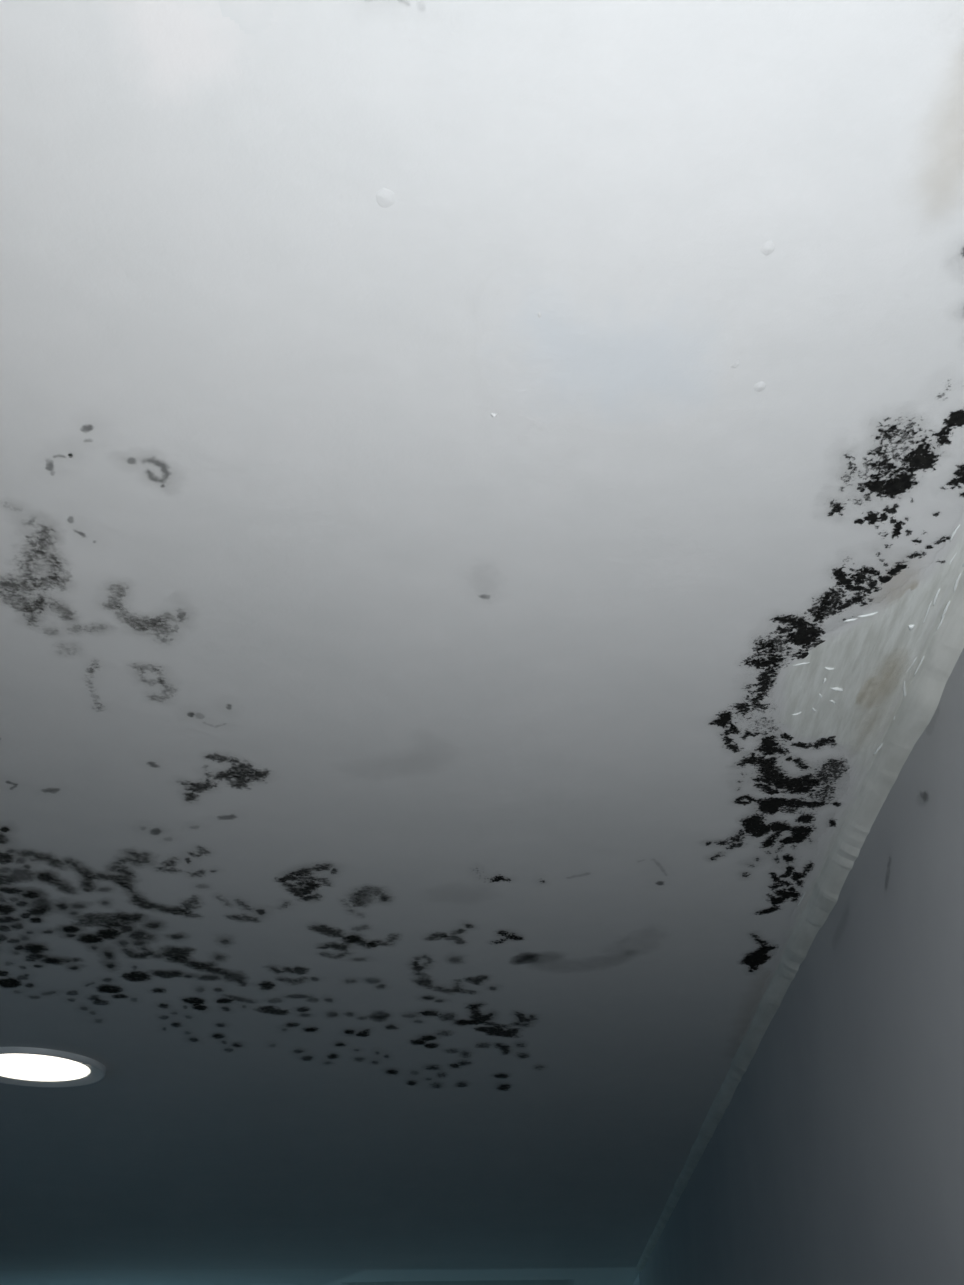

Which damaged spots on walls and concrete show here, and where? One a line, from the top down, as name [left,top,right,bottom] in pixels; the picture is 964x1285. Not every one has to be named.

mould [706,409,964,915]
mould [182,755,268,801]
mould [278,864,336,906]
mould [0,827,241,1008]
damp [310,925,394,957]
damp [492,931,534,963]
mould [740,933,777,972]
damp [259,967,307,990]
mould [182,998,240,1047]
damp [261,1006,318,1032]
damp [328,1029,369,1058]
damp [411,967,541,1088]